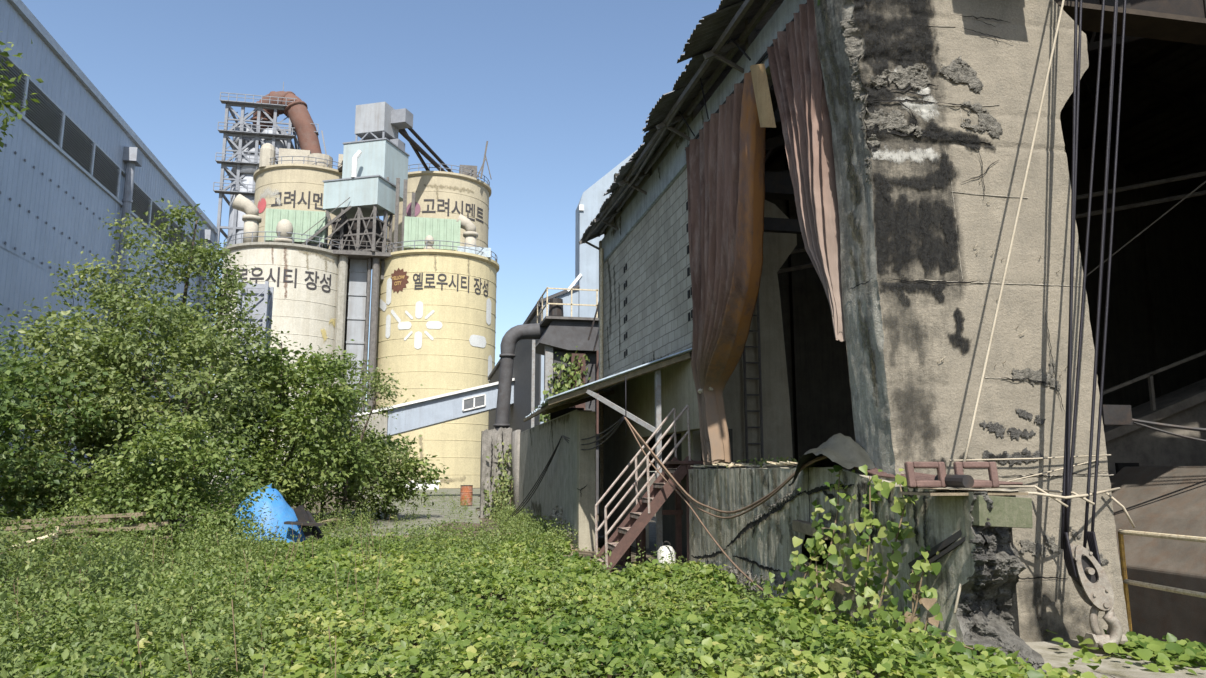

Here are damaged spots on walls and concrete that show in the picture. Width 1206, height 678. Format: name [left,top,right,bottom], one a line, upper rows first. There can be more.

leakage [816,0,996,407]
spalling [840,14,1003,184]